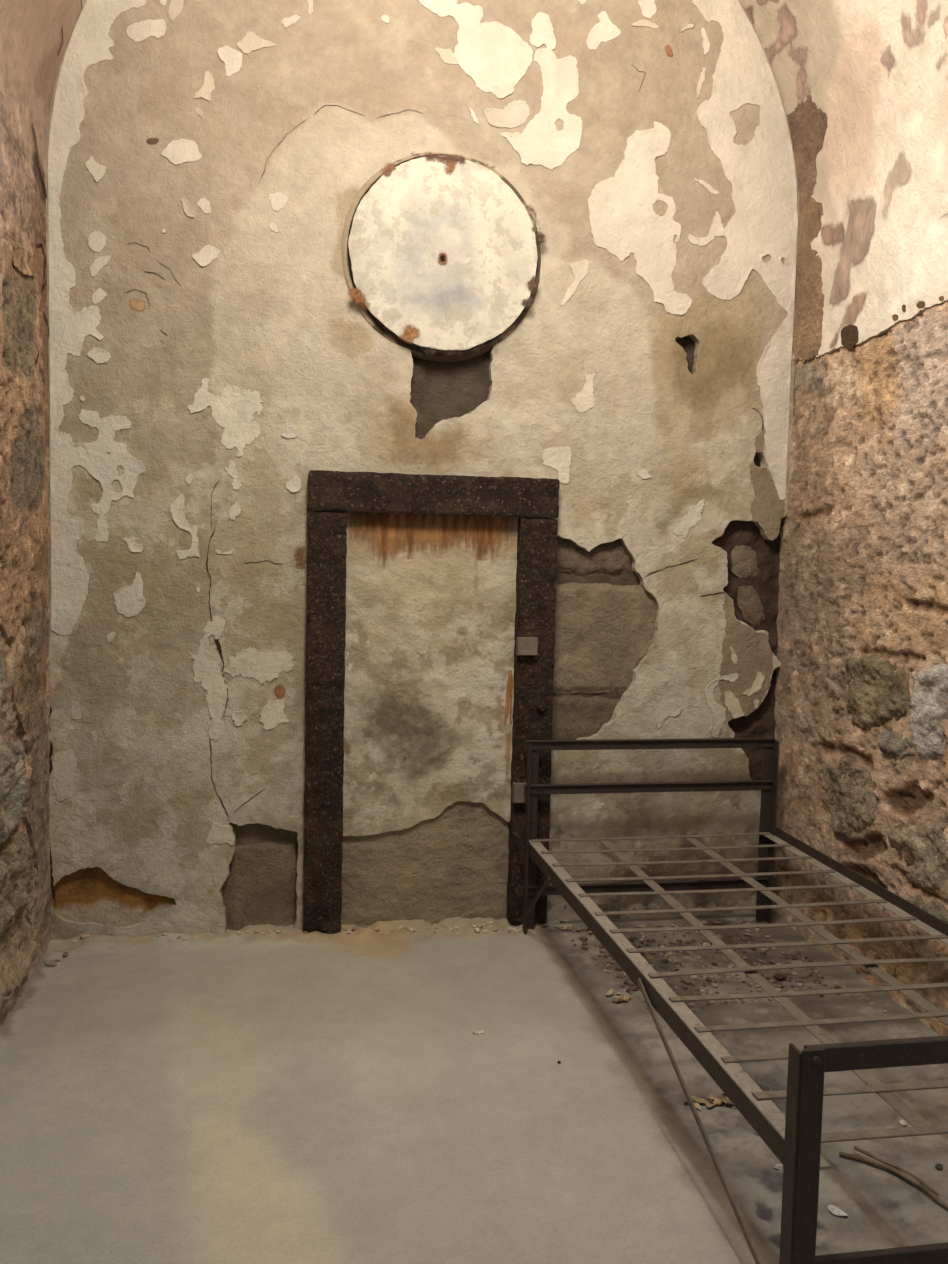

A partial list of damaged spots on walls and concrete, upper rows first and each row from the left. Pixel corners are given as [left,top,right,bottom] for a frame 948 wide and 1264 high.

peeling [418,0,582,170]
rust [347,152,546,356]
peeling [0,0,202,1020]
peeling [188,378,264,520]
rust [355,512,509,563]
flaking render [410,350,491,440]
flaking render [586,0,948,1036]
crack [206,479,263,818]
peeling [190,616,294,740]
flaking render [552,537,657,740]
flaking render [206,822,298,931]
flaking render [341,801,509,926]